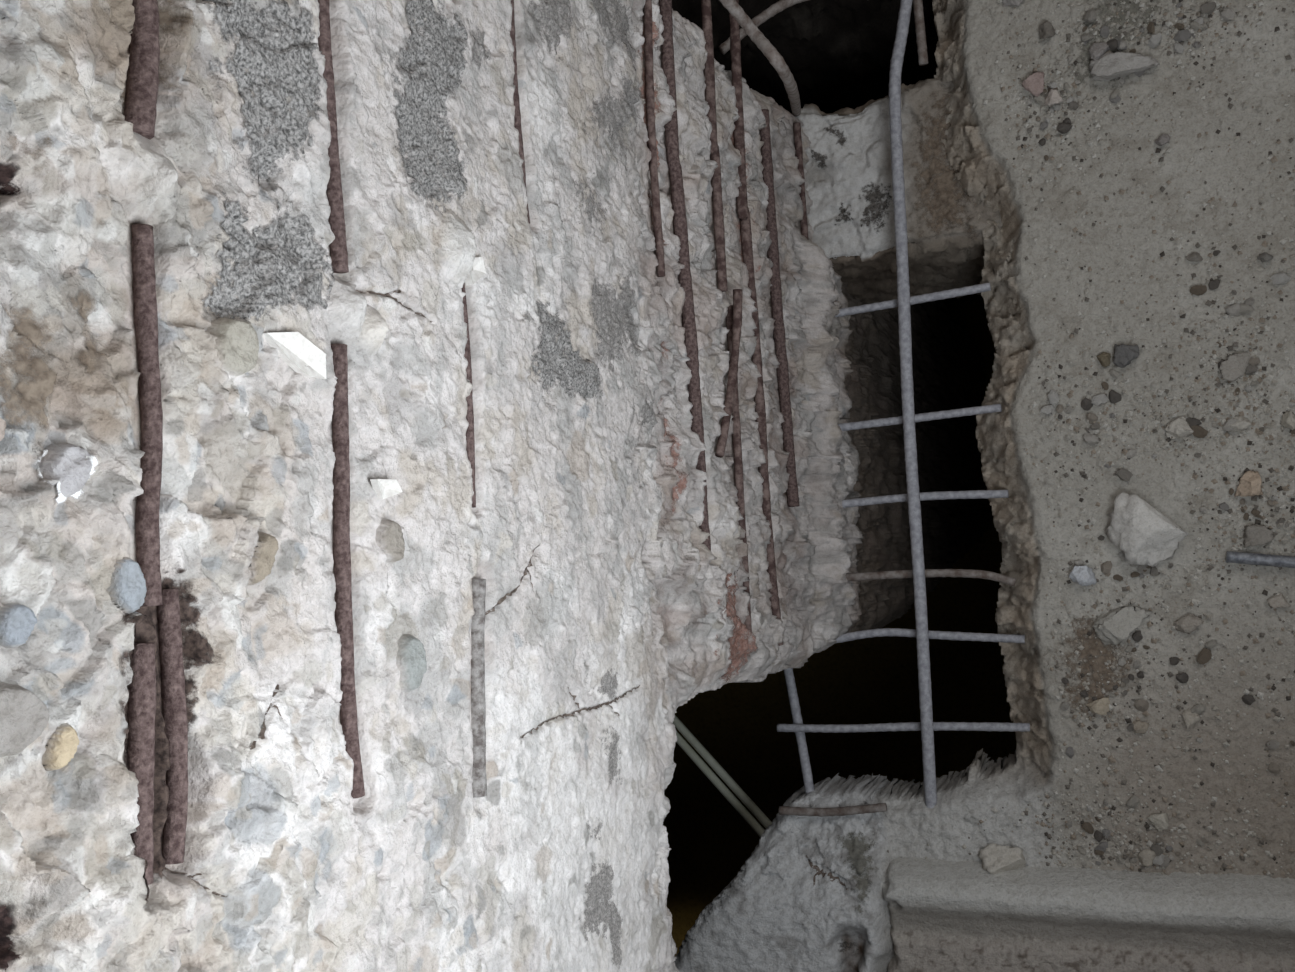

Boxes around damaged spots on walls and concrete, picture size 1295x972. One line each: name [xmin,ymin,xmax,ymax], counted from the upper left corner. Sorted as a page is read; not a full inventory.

spalling [0,163,20,195]
spalling [510,0,573,224]
rust [638,10,662,225]
spalling [522,265,640,406]
rust [657,407,688,512]
spalling [584,0,809,632]
spalling [777,0,1030,817]
rust [120,606,171,901]
rust [162,569,214,730]
crack [520,685,640,738]
rust [715,570,757,682]
spalling [579,863,622,968]